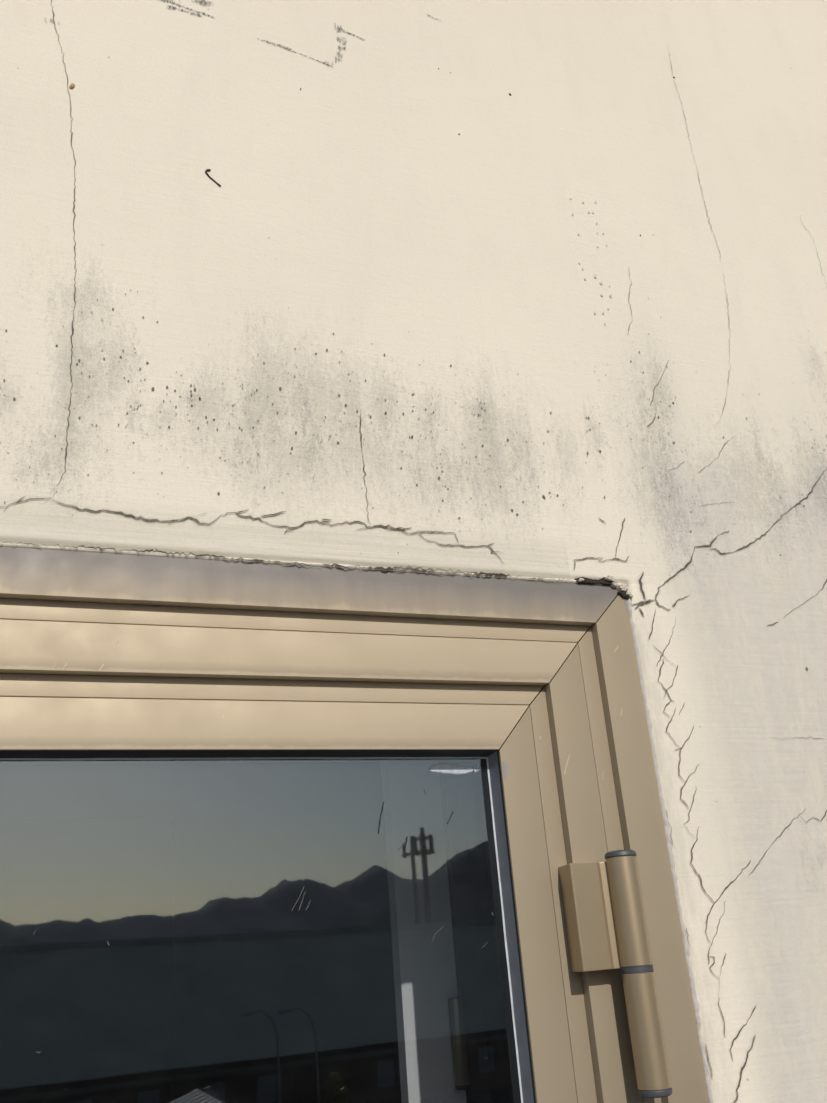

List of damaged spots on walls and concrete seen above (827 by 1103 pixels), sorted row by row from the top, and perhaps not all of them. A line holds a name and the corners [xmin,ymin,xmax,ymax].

crack [51,0,76,262]
leakage [73,344,295,440]
crack [3,285,827,1103]